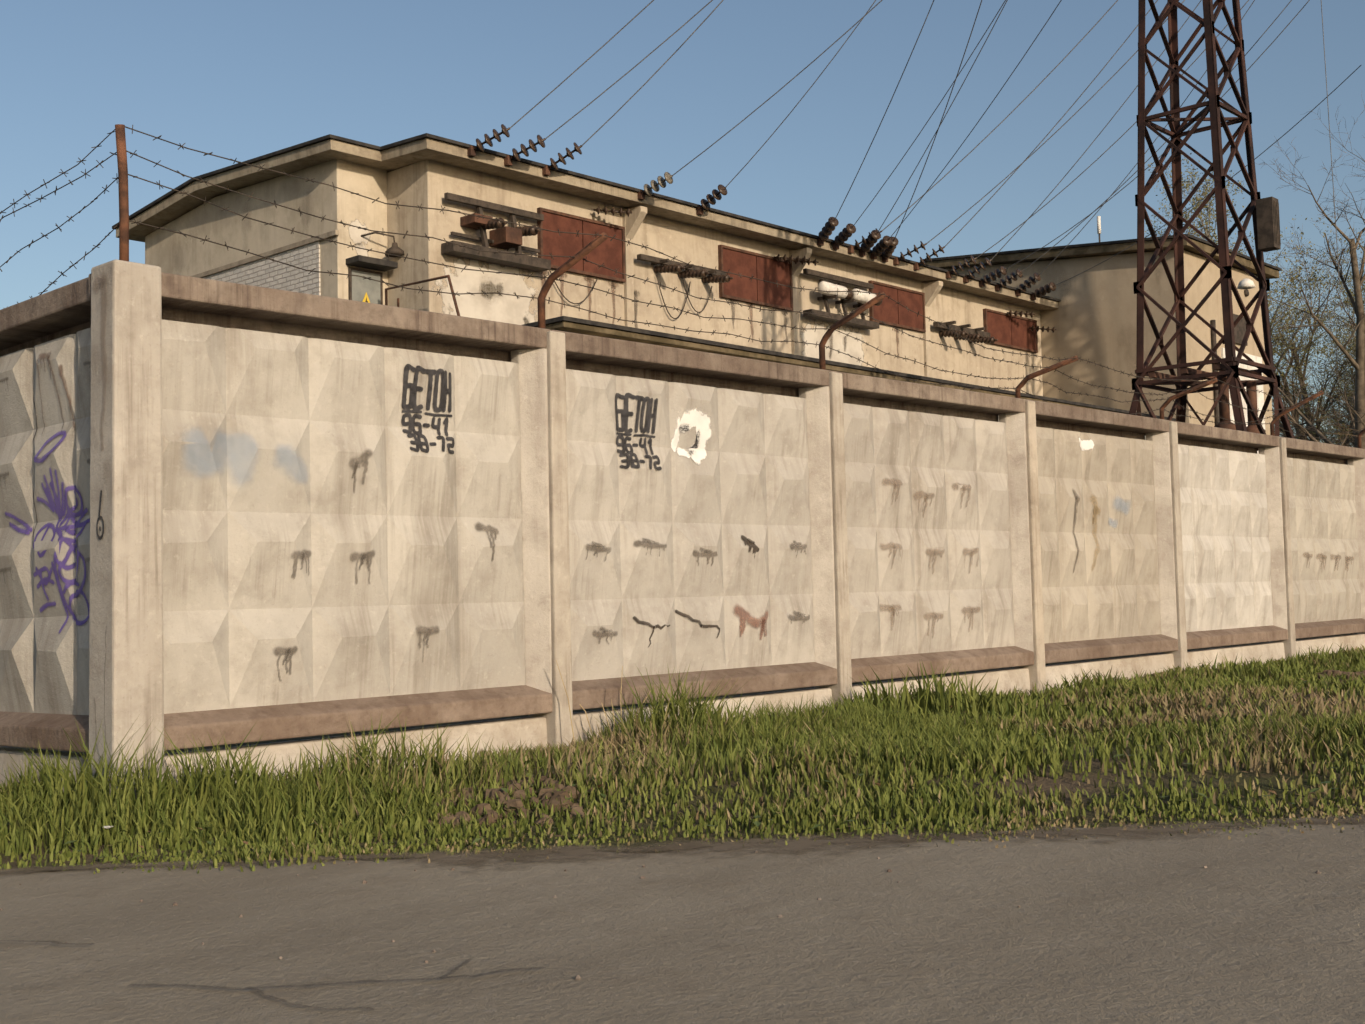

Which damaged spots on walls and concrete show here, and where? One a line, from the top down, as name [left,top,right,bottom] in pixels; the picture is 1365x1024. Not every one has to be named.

rust [36,354,75,428]
rust [736,607,768,639]